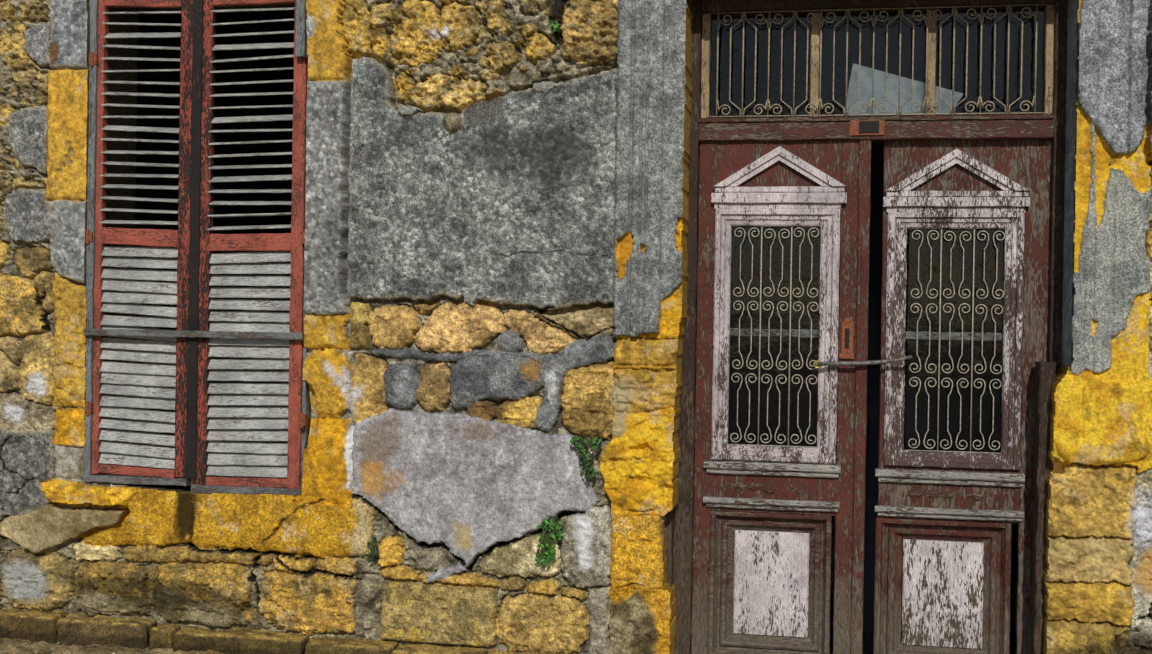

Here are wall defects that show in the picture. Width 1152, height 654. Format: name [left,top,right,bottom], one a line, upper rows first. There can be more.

spalling [342,0,619,116]
peeling [1073,90,1152,273]
peeling [616,233,646,279]
spalling [344,285,682,445]
peeling [1067,292,1151,376]
crack [0,436,37,515]
crack [156,499,363,607]
spalling [352,494,672,654]
crack [1134,603,1152,622]